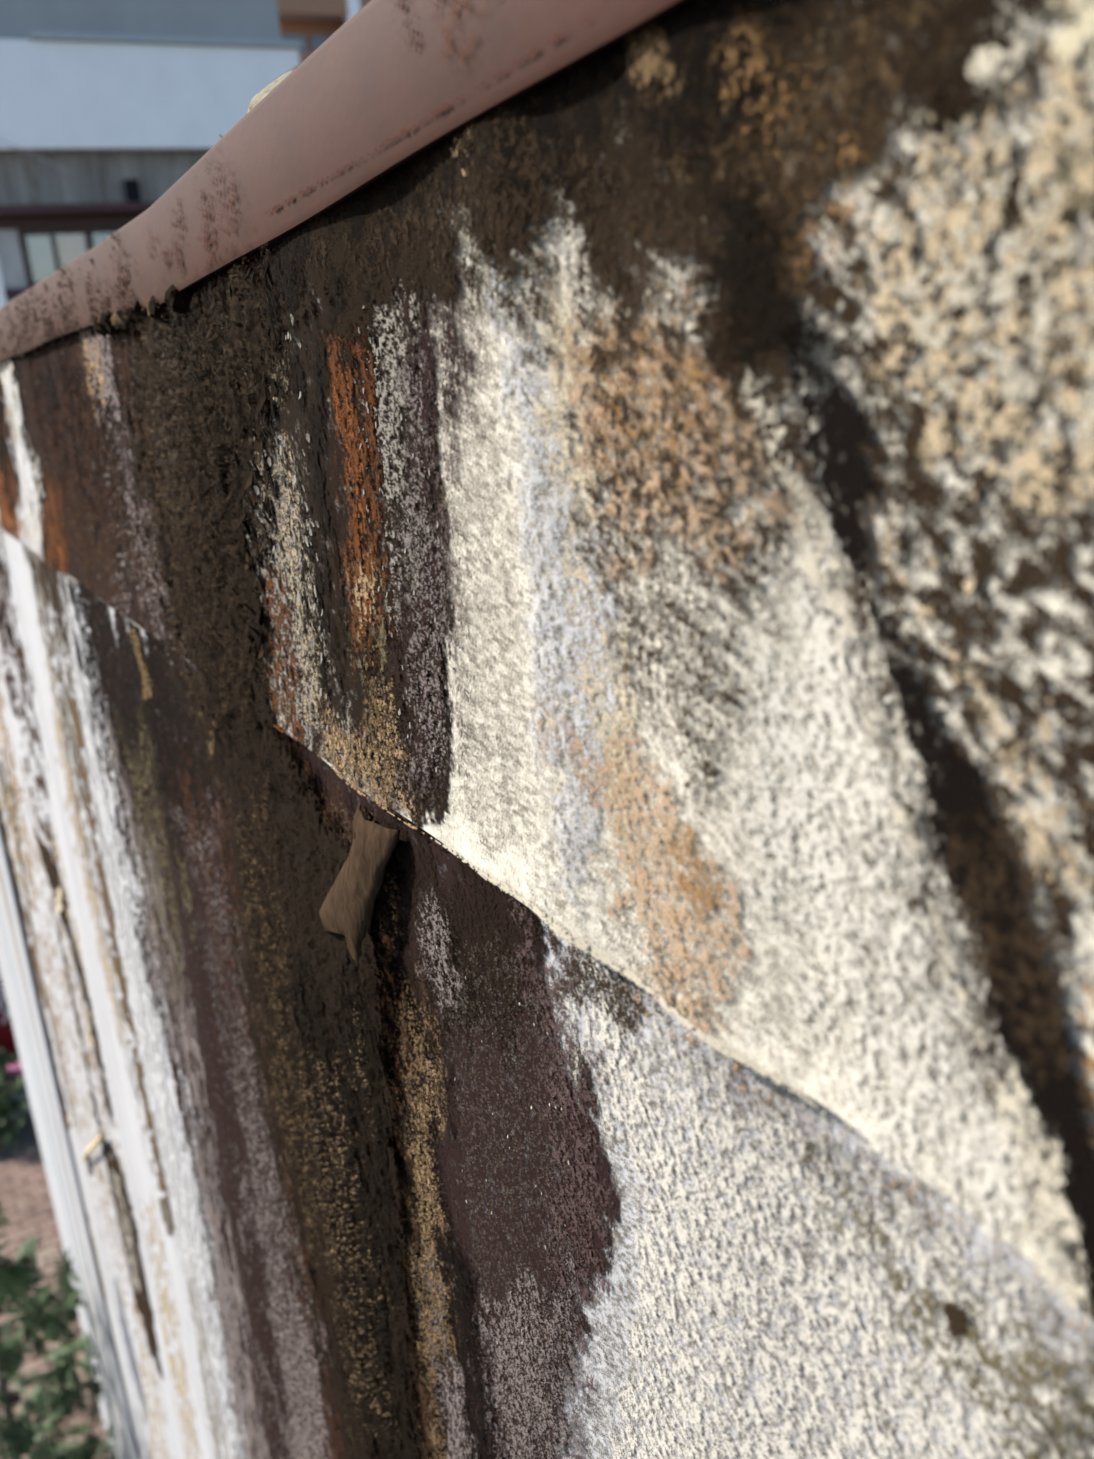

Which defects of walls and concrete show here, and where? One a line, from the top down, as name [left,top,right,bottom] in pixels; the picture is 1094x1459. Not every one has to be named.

leakage [1051,54,1094,169]
leakage [0,606,18,683]
corrosion [129,261,424,917]
crack [704,184,1094,1322]
leakage [0,695,169,1459]
leakage [1071,1048,1094,1140]
leakage [188,1277,227,1459]